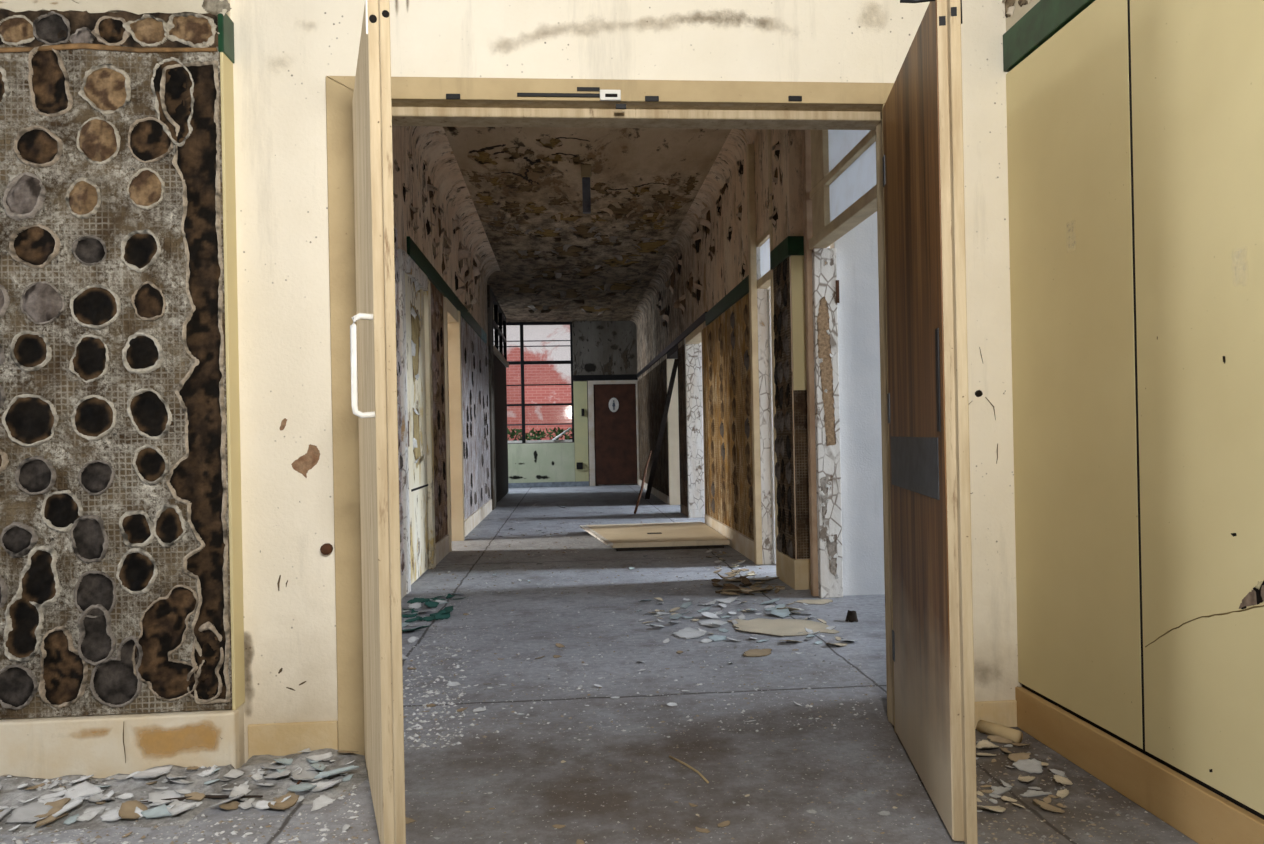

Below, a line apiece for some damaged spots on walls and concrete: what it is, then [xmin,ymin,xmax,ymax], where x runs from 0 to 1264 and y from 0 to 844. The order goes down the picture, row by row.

peeling [0,0,232,48]
peeling [467,138,698,315]
peeling [291,444,320,478]
crack [1145,605,1264,647]